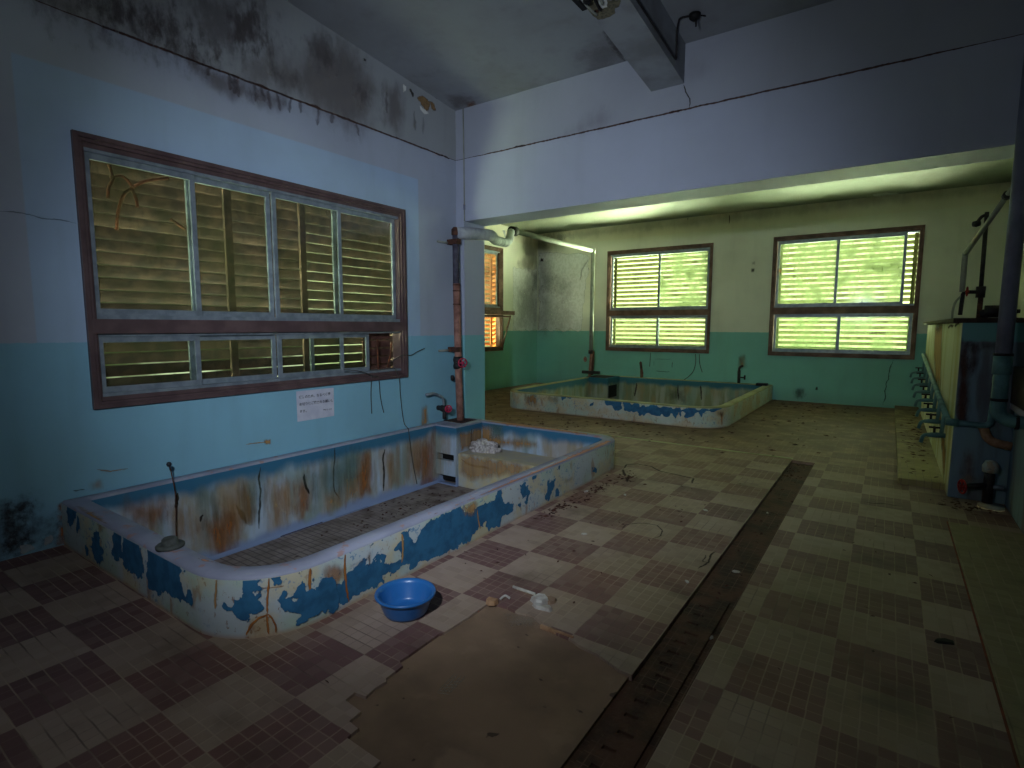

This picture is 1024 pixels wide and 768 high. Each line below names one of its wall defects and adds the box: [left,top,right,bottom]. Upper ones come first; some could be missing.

peeling [590,401,722,418]
peeling [66,507,193,606]